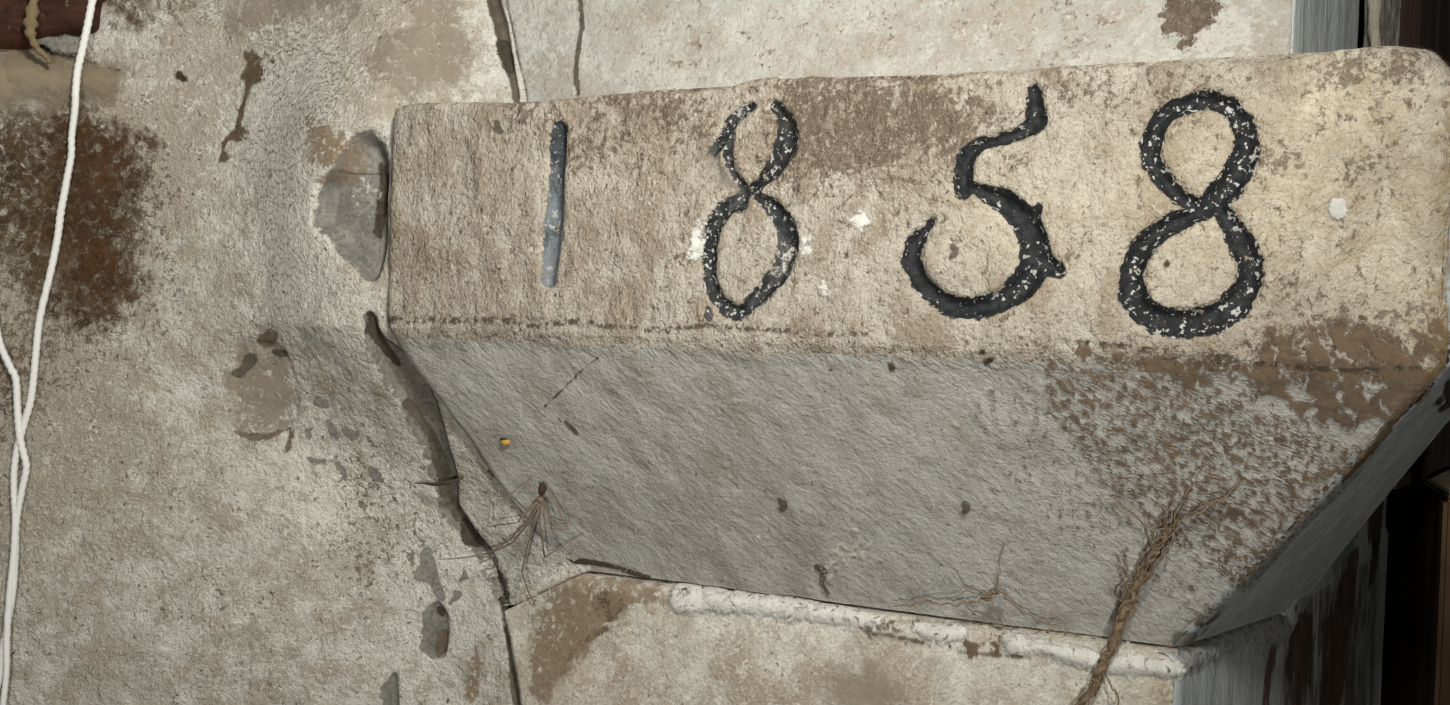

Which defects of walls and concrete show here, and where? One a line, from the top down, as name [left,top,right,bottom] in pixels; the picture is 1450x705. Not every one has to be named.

damp [107,0,196,27]
crack [487,0,520,103]
crack [574,0,585,95]
damp [0,94,159,333]
damp [0,344,58,417]
peeling [973,308,1450,646]